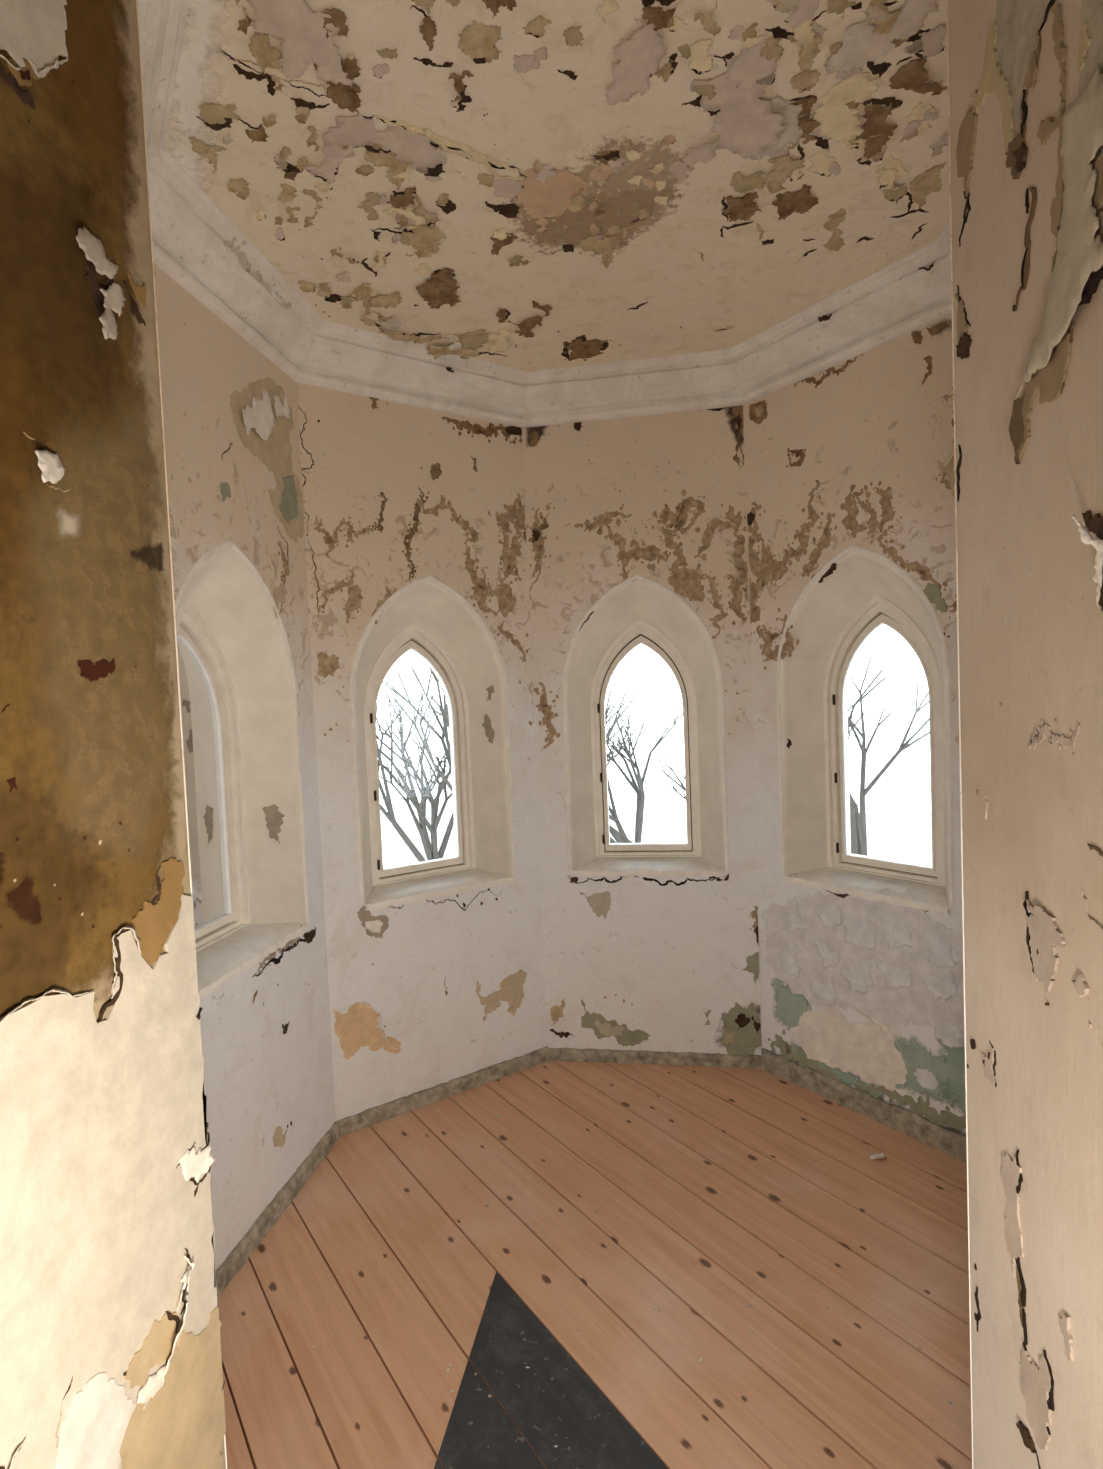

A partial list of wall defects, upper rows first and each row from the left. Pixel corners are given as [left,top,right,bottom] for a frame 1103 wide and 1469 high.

leakage [164,0,227,189]
peeling [189,0,584,373]
leakage [511,140,693,268]
peeling [569,0,1103,464]
leakage [0,0,174,1018]
peeling [574,475,957,670]
peeling [253,924,316,1006]
flaking render [704,1002,762,1055]
peeling [761,888,997,1091]
peeling [0,858,226,1469]
crack [973,1263,981,1332]
crack [1058,1314,1074,1361]